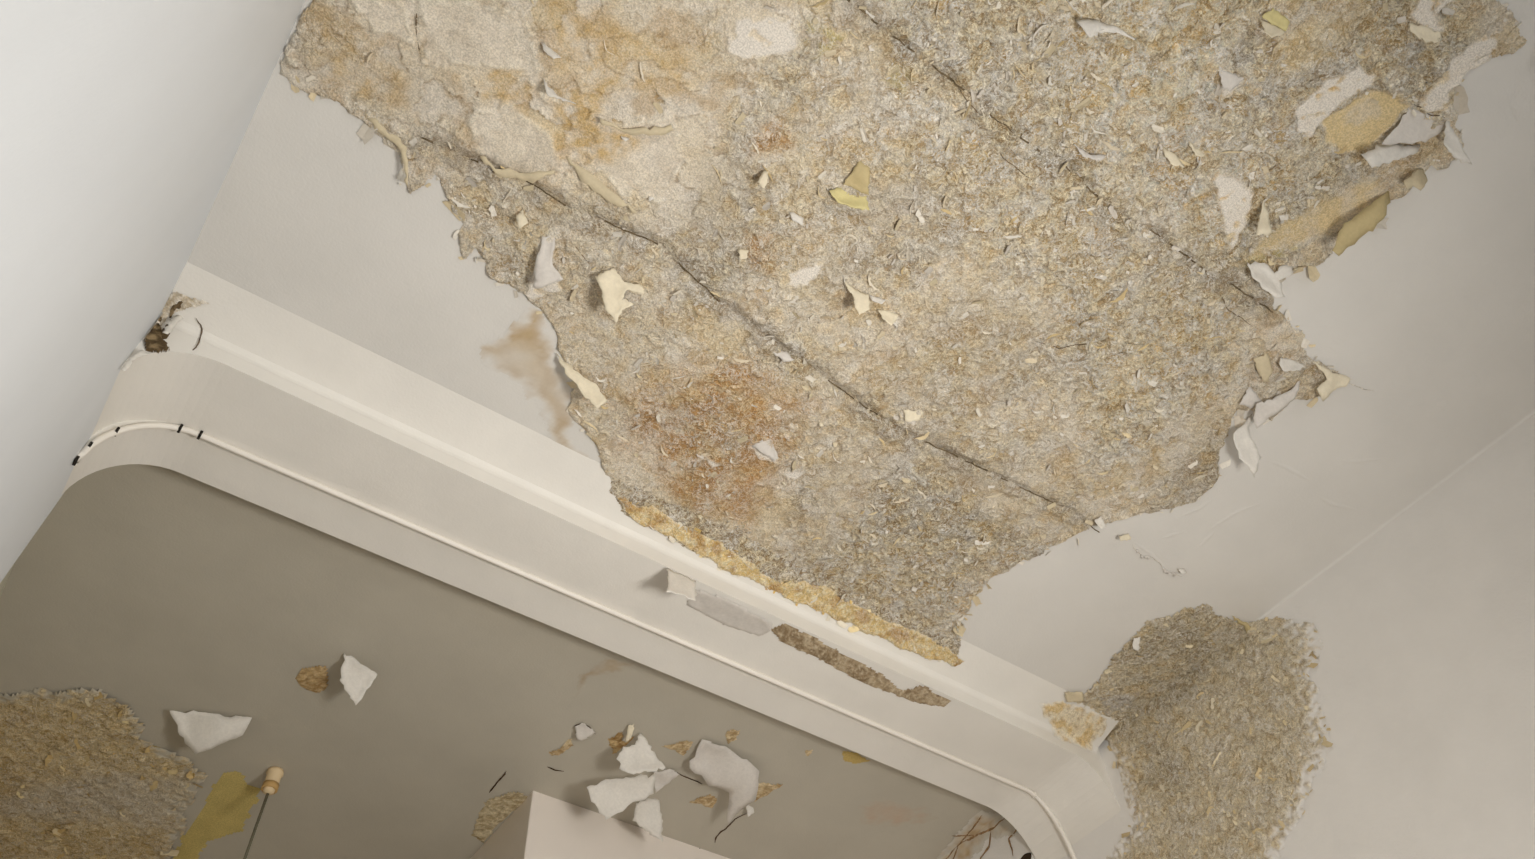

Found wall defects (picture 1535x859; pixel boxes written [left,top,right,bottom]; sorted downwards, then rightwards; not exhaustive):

crack [847,0,1099,197]
crack [526,181,569,210]
crack [604,220,720,302]
peeling [279,0,1527,667]
crack [1150,229,1273,326]
crack [828,380,878,459]
crack [925,442,1054,503]
peeling [0,687,252,859]
spalling [295,654,377,705]
peeling [548,723,783,849]
peeling [666,568,951,707]
peeling [1039,604,1336,859]